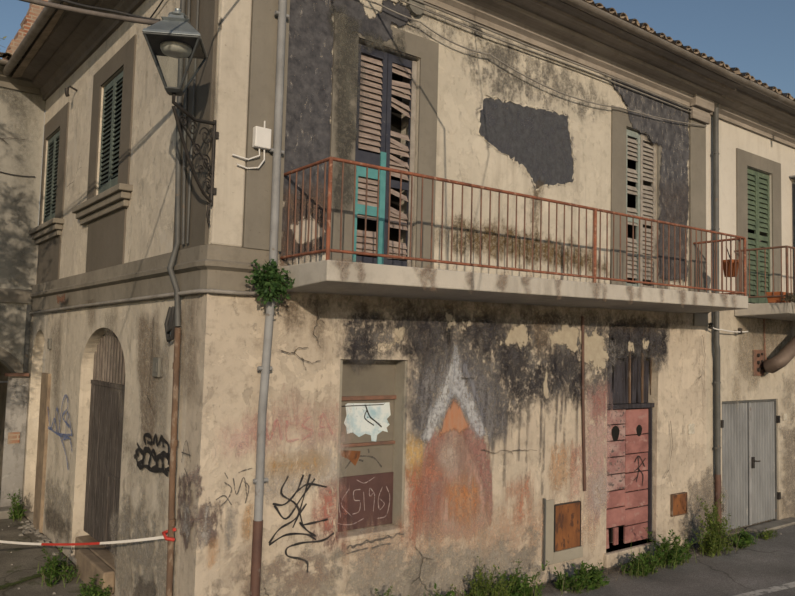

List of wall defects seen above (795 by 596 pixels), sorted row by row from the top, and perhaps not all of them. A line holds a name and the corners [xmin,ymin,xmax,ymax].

damp [468,24,597,116]
flaking render [279,0,412,267]
flaking render [477,94,576,209]
flaking render [605,76,690,282]
crack [281,303,325,368]